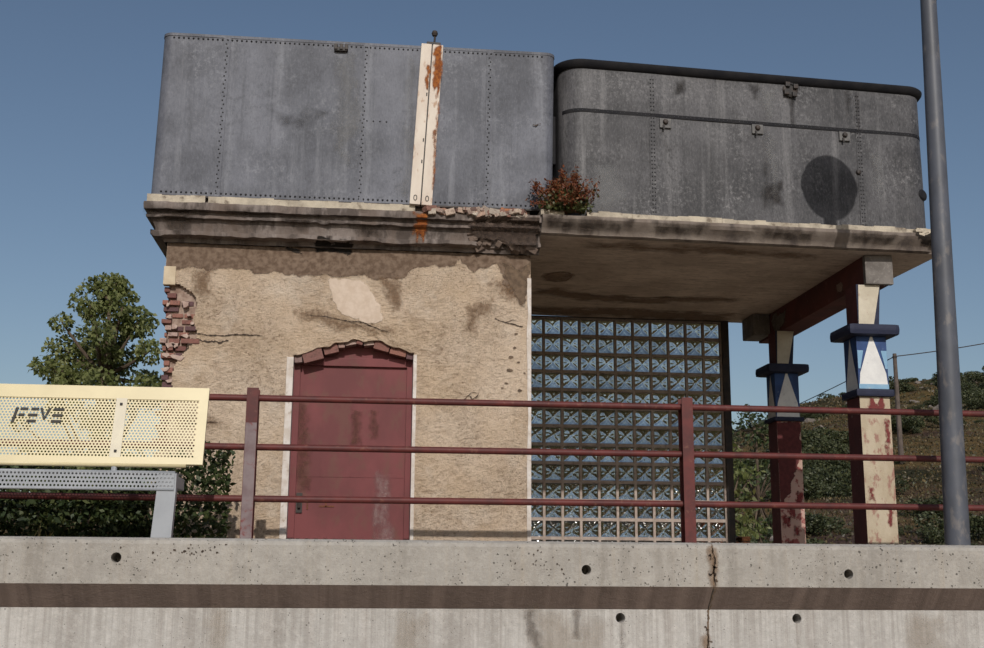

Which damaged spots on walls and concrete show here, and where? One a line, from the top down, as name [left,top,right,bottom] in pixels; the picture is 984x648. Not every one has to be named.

corrosion [425,45,443,184]
corrosion [413,211,427,242]
leakage [152,208,730,321]
leakage [597,244,810,258]
leakage [754,226,809,238]
spalling [913,228,931,246]
spalling [160,285,200,387]
spalling [152,401,175,451]
peeling [783,491,803,544]
crack [705,544,718,648]